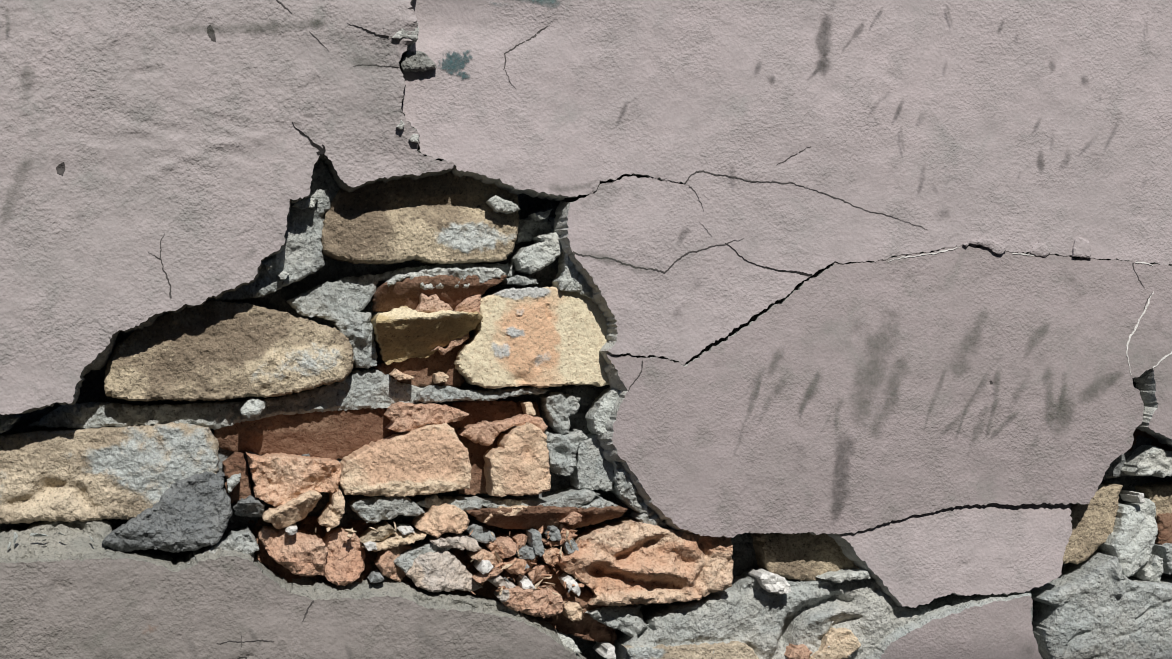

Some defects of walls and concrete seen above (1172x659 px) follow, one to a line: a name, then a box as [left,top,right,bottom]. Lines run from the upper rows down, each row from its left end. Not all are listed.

crack [292,122,326,155]
crack [349,24,399,68]
spalling [0,159,932,659]
crack [565,146,978,391]
crack [1069,255,1172,373]
spalling [1030,435,1172,659]